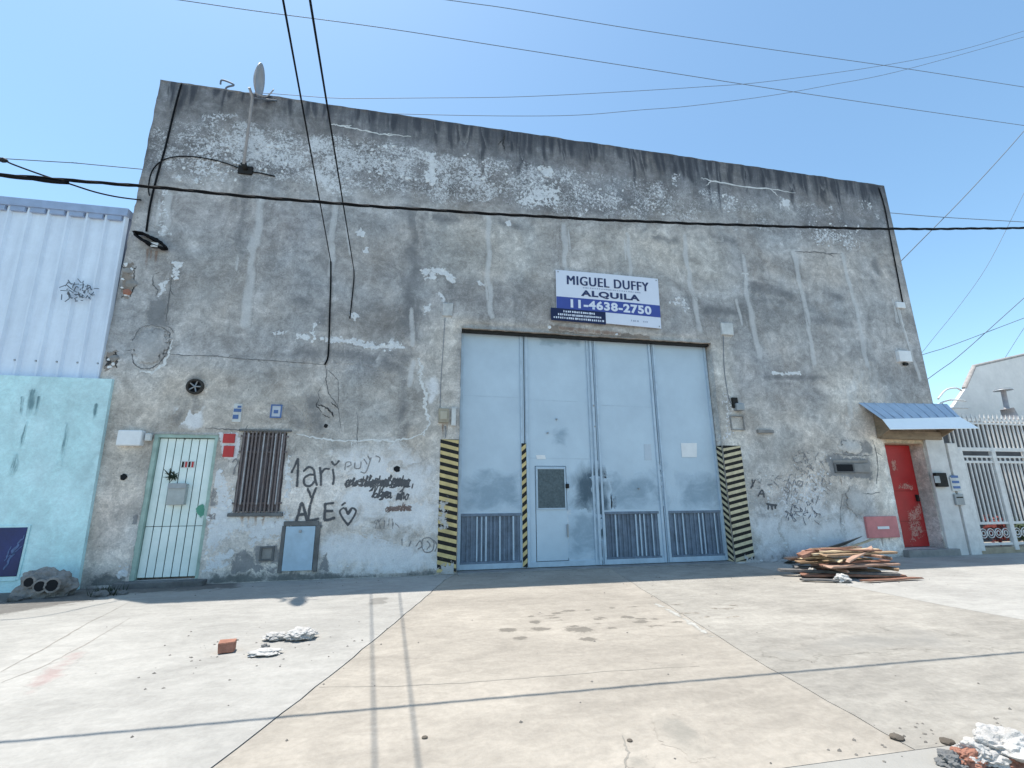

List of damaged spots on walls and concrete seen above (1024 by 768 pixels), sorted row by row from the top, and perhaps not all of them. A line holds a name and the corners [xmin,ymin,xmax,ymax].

damp [166,81,332,126]
damp [356,109,598,182]
crack [105,265,431,450]
damp [624,225,881,429]